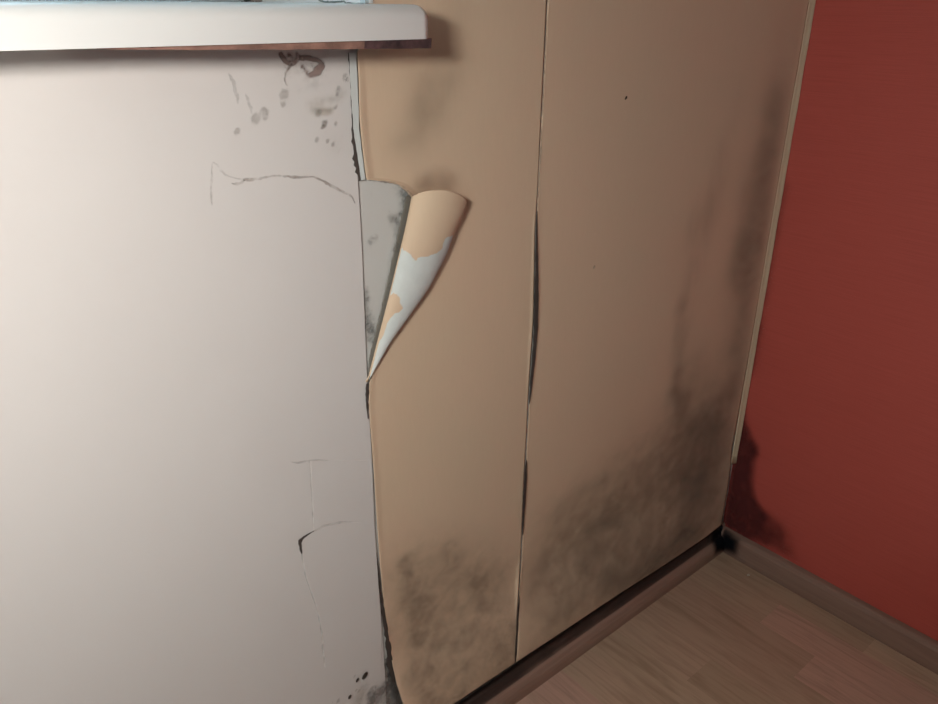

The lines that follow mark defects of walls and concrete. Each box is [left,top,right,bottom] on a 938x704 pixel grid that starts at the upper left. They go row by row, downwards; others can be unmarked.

crack [529,217,539,404]
crack [520,460,528,535]
damp [454,421,781,704]
crack [513,585,521,663]
damp [369,663,402,704]